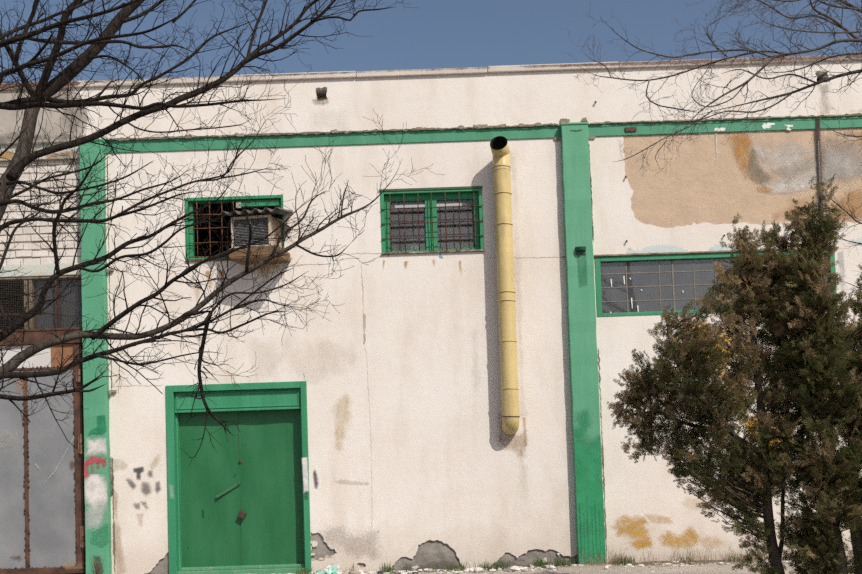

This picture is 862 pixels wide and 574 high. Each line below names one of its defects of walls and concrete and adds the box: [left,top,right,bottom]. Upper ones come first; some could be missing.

flaking render [109,118,570,140]
peeling [581,114,862,228]
crack [300,252,379,472]
flaking render [145,552,169,574]
flaking render [311,533,337,559]
flaking render [392,540,463,570]
flaking render [492,549,577,567]